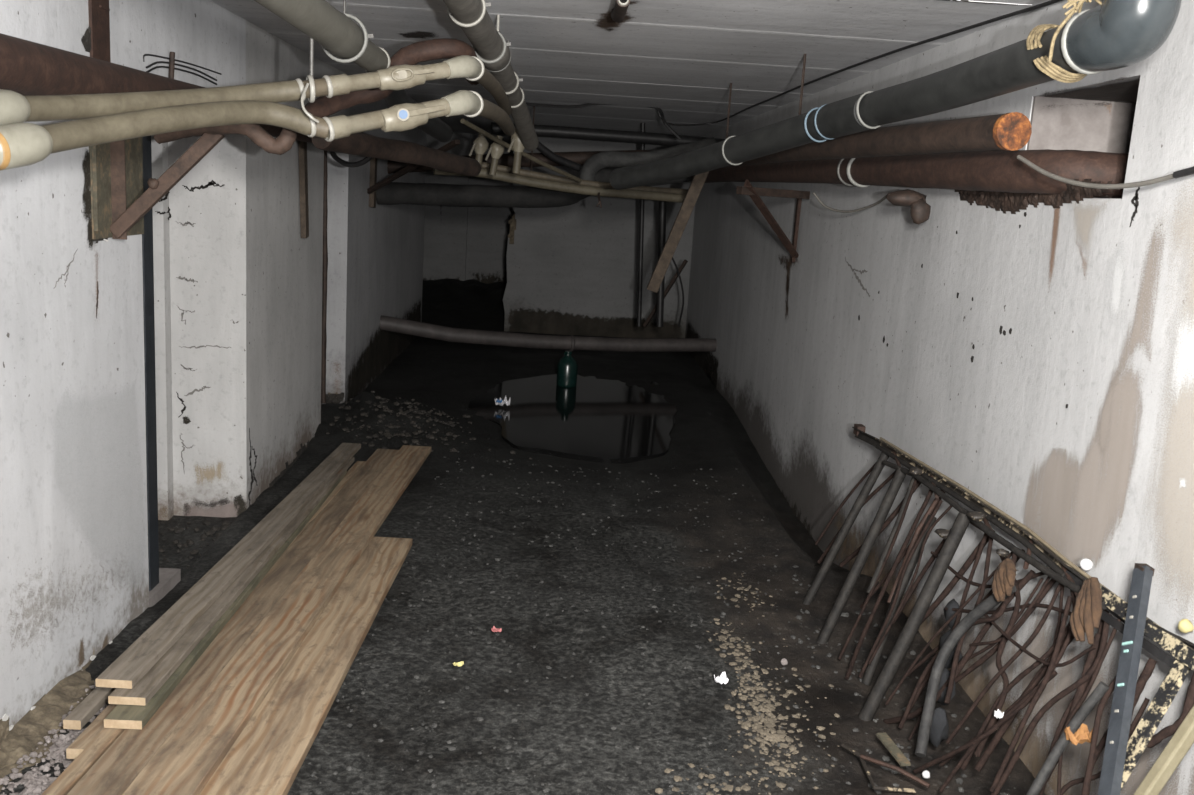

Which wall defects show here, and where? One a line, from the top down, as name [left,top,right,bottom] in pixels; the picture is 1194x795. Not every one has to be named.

crack [155,180,224,227]
crack [1129,187,1140,227]
crack [54,249,78,288]
crack [176,276,231,474]
water stain [1022,174,1194,637]
crack [248,428,258,506]
water stain [948,576,1120,795]
water stain [1120,698,1185,795]
water stain [1159,754,1194,795]